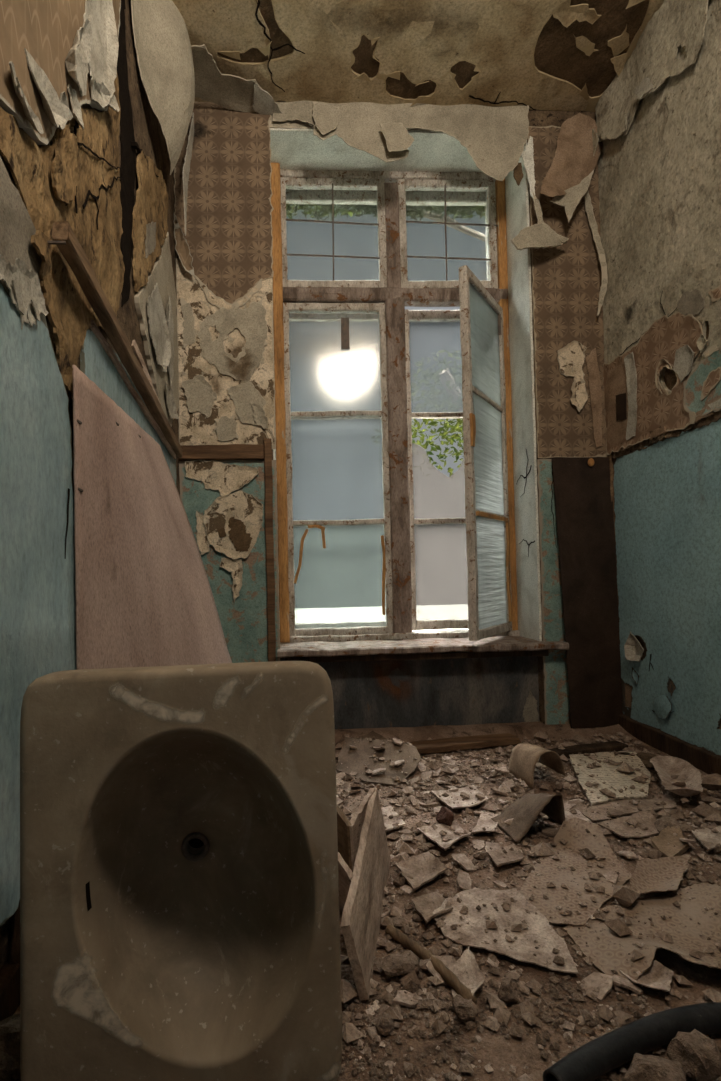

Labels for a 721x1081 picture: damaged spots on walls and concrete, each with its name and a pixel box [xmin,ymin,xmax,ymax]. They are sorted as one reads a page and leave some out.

peeling [191,0,529,181]
spalling [534,0,649,102]
spalling [0,0,269,441]
peeling [185,460,263,602]
peeling [624,632,644,707]